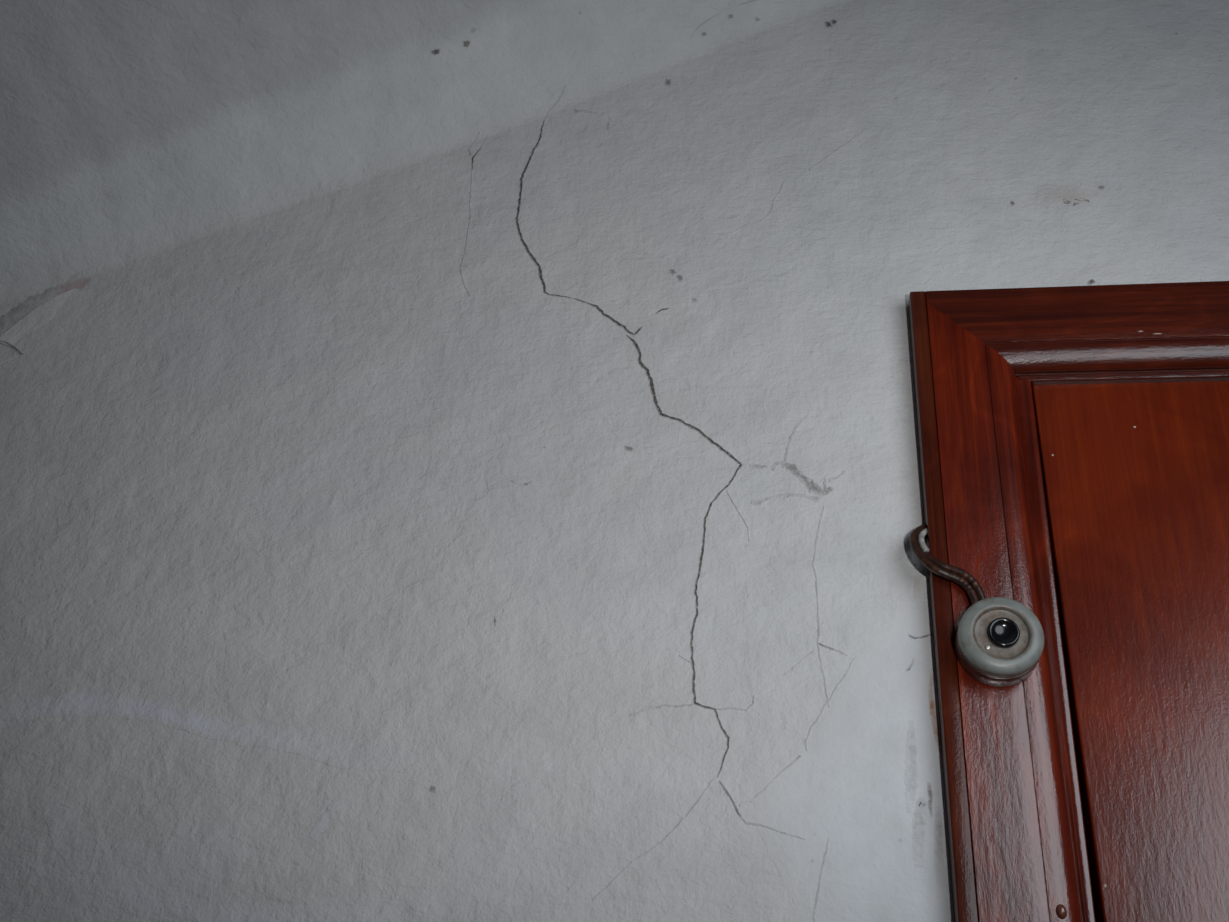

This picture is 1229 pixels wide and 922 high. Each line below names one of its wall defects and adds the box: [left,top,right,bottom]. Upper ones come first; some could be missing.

crack [515,85,856,922]